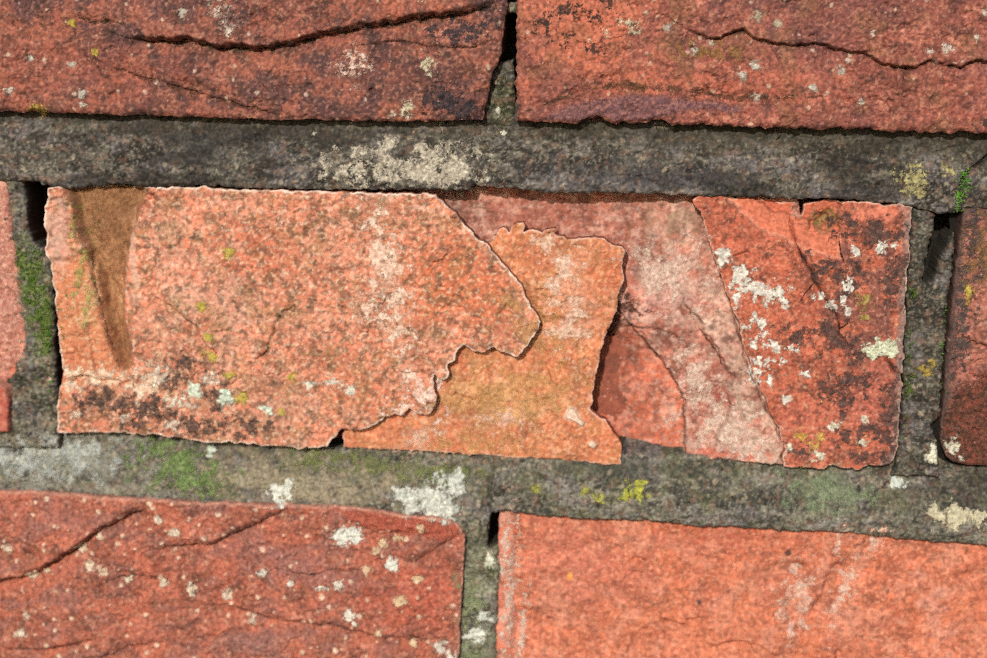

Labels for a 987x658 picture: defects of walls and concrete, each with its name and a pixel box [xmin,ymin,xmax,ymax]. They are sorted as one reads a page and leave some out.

leakage [25,256,172,413]
peeling [44,184,913,470]
crack [789,221,851,330]